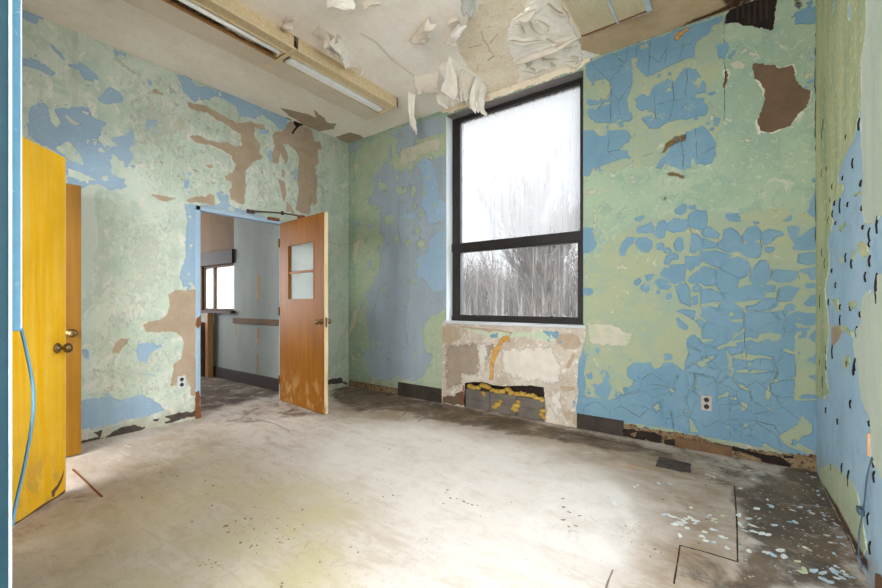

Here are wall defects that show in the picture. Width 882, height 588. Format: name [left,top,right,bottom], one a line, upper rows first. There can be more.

peeling [22,9,44,25]
peeling [22,54,62,82]
peeling [51,44,129,105]
crack [593,39,693,159]
peeling [22,100,136,291]
flaking render [136,75,336,397]
peeling [325,0,882,557]
crack [583,269,798,447]
crack [579,435,672,455]